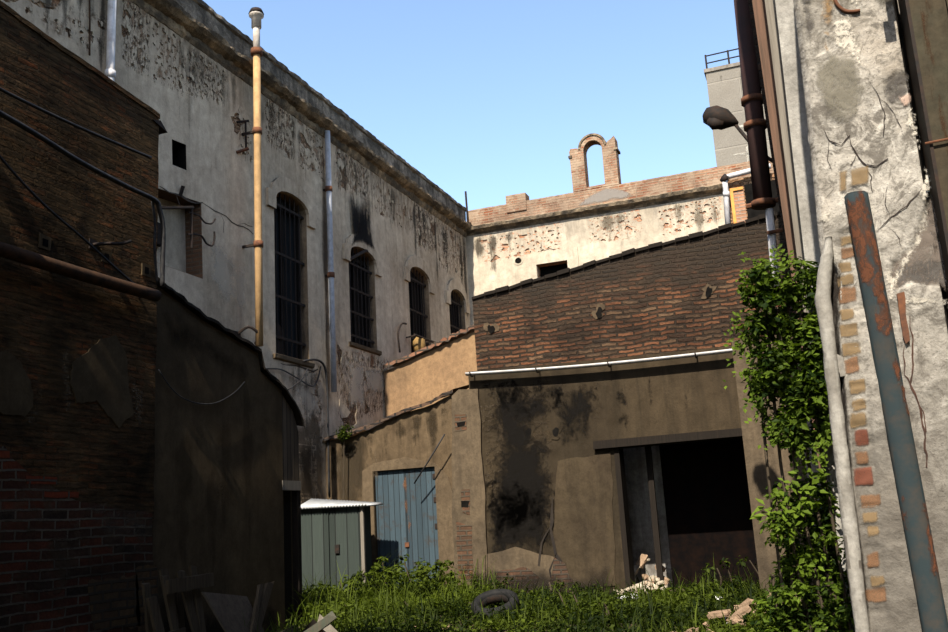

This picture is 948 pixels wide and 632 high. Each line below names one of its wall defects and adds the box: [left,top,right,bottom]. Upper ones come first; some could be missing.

peeling [4,0,104,49]
peeling [121,0,223,103]
crack [825,83,922,245]
peeling [480,222,562,262]
corrosion [847,191,892,336]
flaking render [831,236,880,536]
flaking render [862,551,886,602]